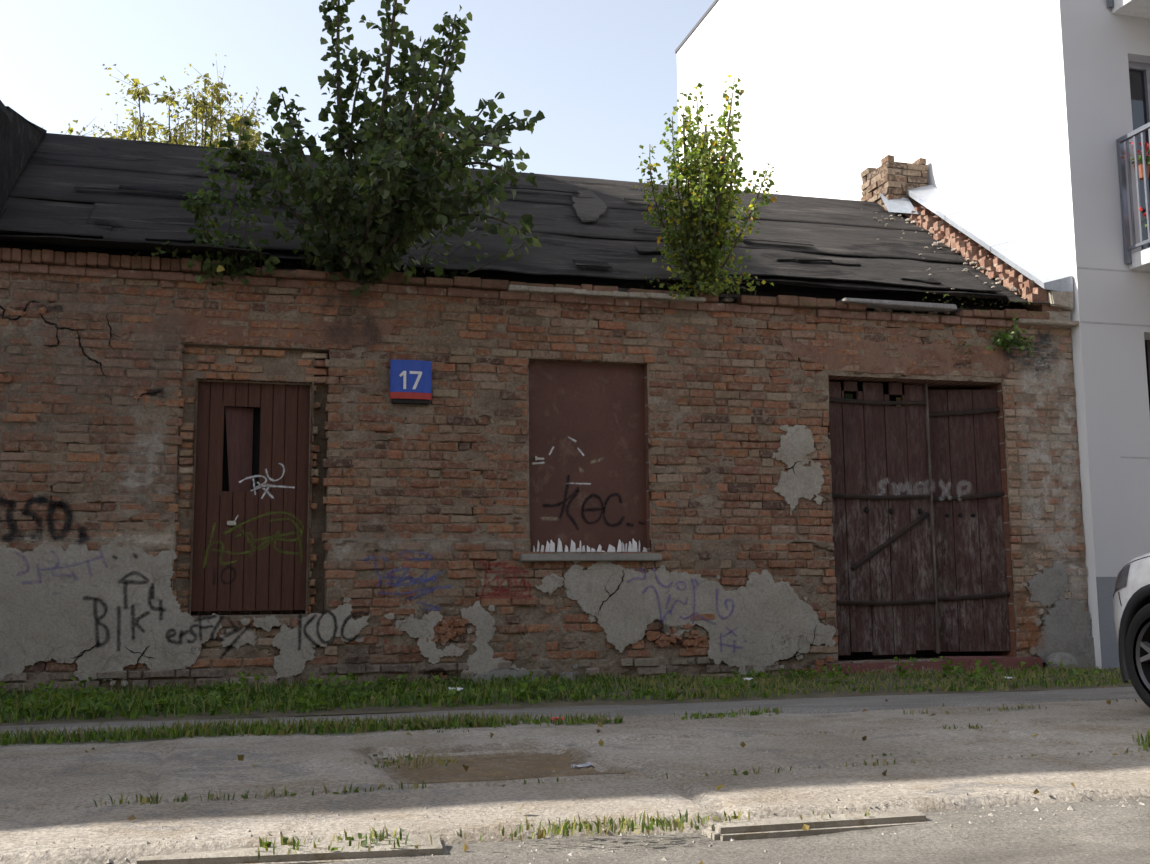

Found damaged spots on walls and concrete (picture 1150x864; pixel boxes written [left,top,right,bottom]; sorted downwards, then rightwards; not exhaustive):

crack [0,301,119,379]
flaking render [771,424,824,516]
flaking render [0,534,526,687]
flaking render [535,561,836,676]
flaking render [1022,560,1096,669]